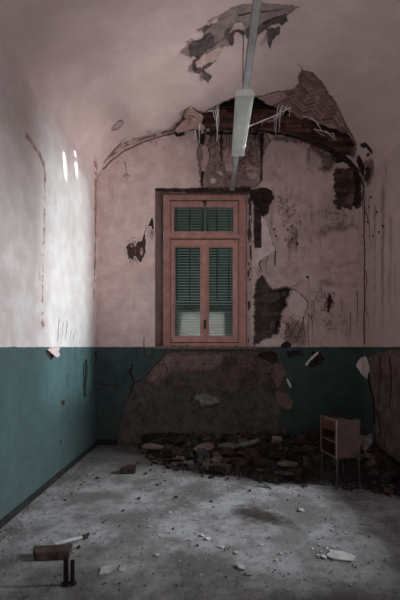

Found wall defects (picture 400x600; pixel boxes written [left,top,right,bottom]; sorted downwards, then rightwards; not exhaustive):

peeling [188,4,252,83]
peeling [257,2,300,48]
spalling [333,167,363,210]
spalling [117,69,357,445]
damp [260,293,332,348]
spalling [356,350,400,462]